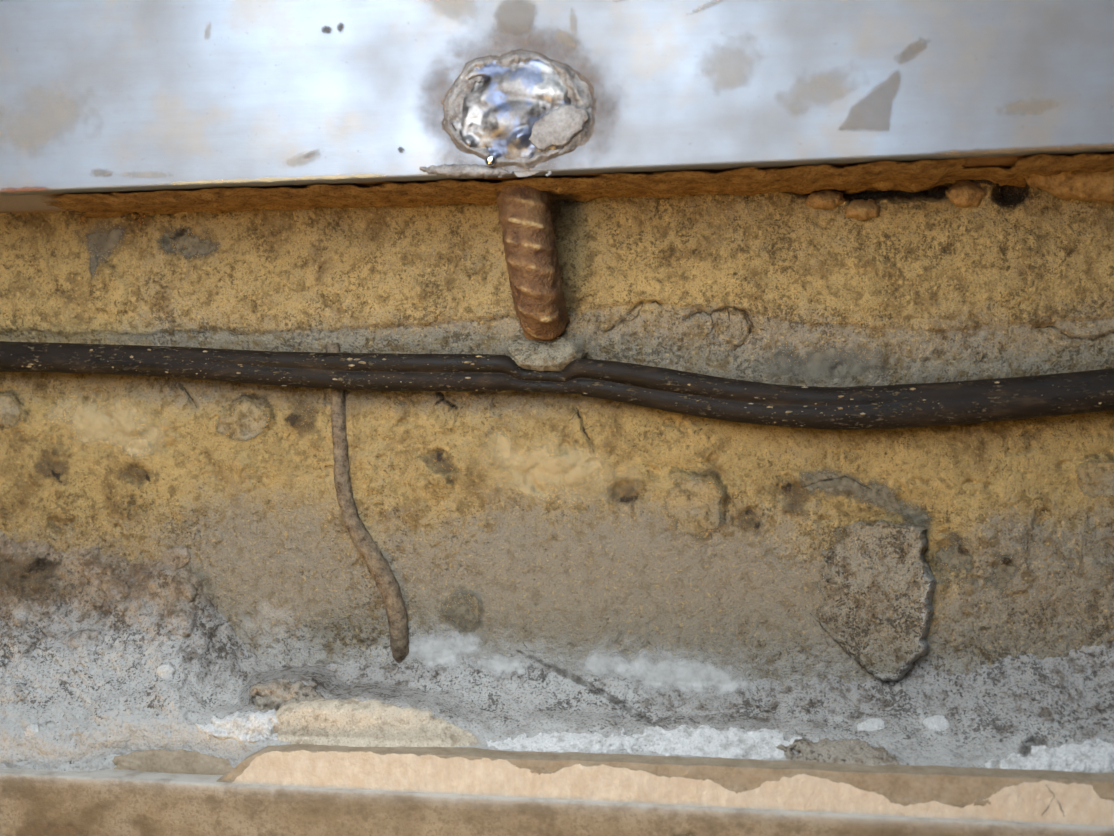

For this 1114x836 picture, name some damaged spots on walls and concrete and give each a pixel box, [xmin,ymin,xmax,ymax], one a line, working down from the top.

spalling [158,227,220,258]
spalling [496,179,570,341]
crack [605,300,662,332]
crack [686,307,764,351]
crack [1034,326,1114,341]
spalling [286,401,315,431]
spalling [424,450,453,473]
spalling [0,553,55,596]
peeling [781,470,973,682]
water stain [406,632,525,675]
water stain [583,652,747,694]
spalling [232,750,1114,827]